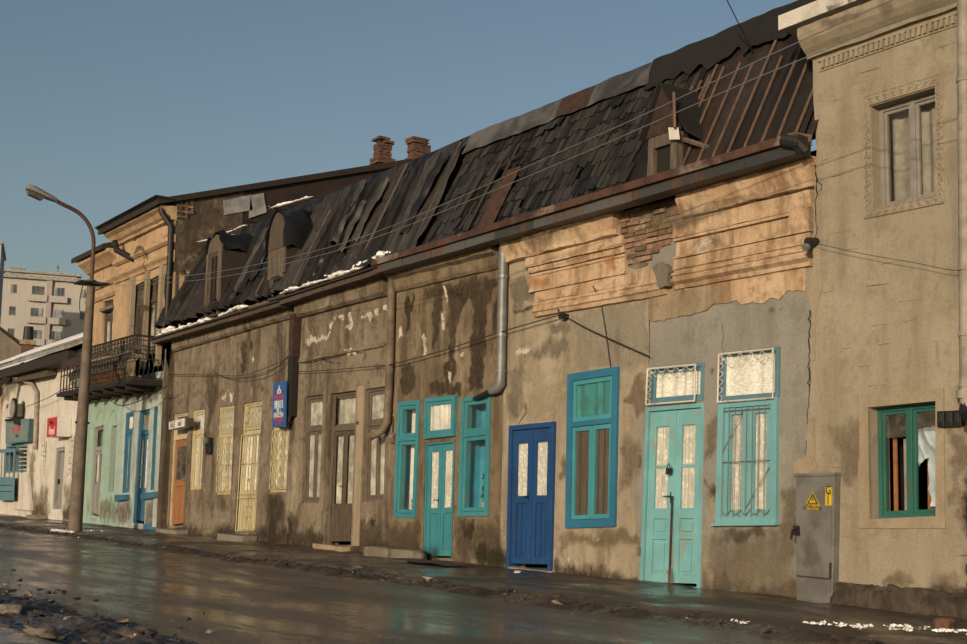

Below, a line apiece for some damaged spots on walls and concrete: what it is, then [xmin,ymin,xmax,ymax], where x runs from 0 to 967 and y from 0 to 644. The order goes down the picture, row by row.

spalling [620,198,680,269]
peeling [306,305,387,346]
damp [400,364,415,395]
damp [411,277,498,396]
damp [516,324,568,359]
crack [805,291,832,454]
crack [843,261,923,386]